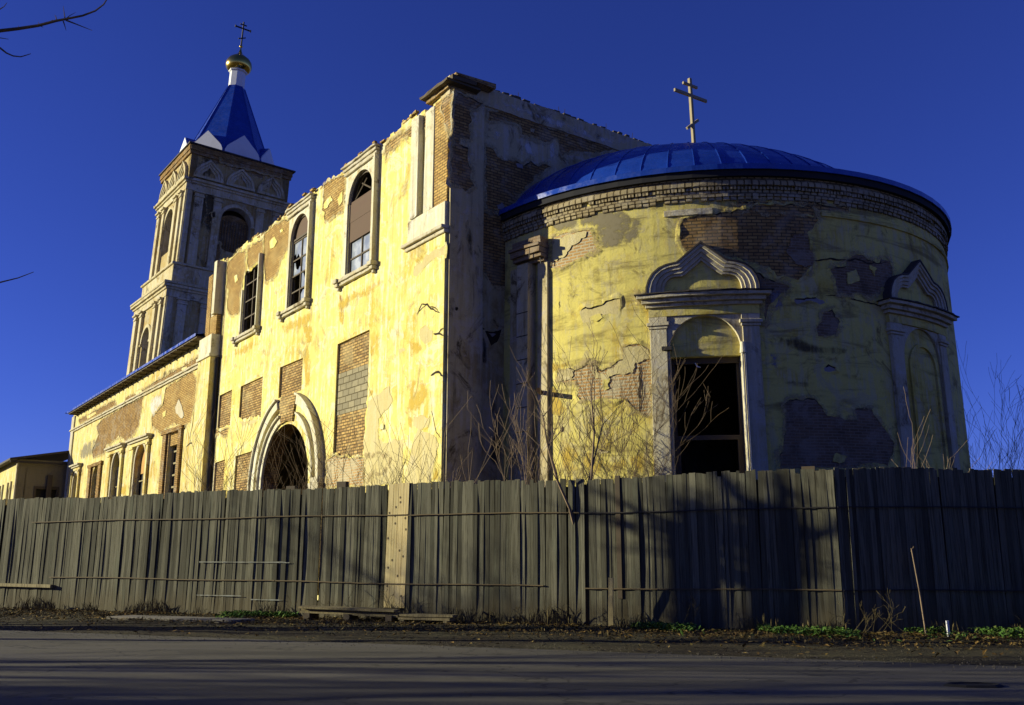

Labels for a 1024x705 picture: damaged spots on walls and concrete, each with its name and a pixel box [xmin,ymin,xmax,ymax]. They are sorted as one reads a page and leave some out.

peeling [382,89,614,291]
peeling [674,199,896,341]
peeling [78,355,198,460]
peeling [552,338,653,421]
peeling [772,394,897,474]